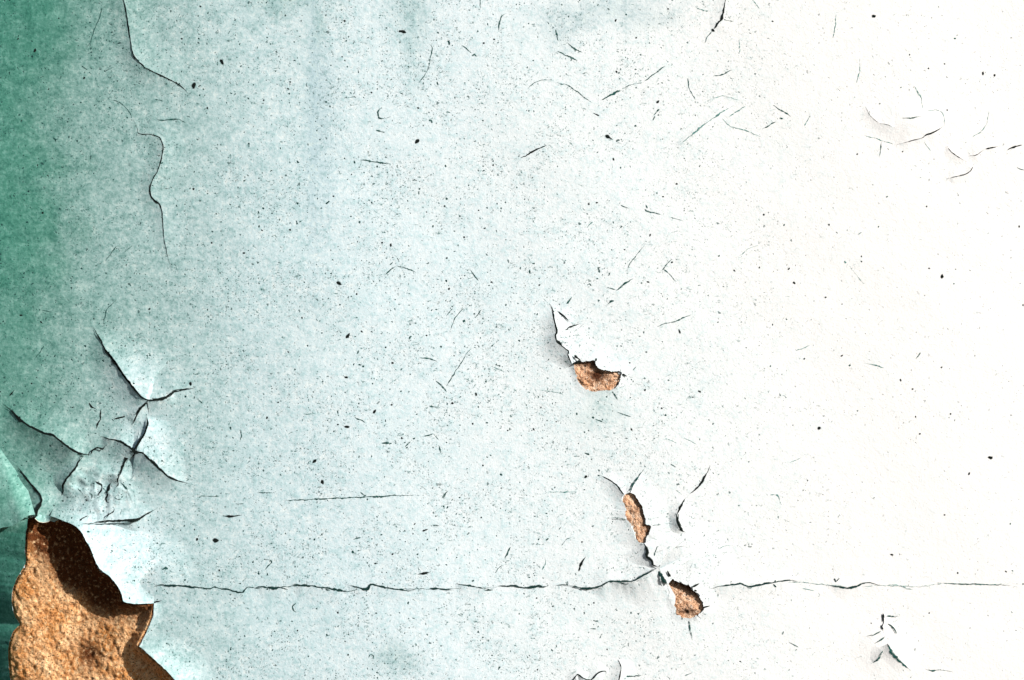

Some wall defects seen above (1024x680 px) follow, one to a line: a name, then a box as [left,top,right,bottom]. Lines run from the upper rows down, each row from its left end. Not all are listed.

crack [82,0,198,270]
peeling [0,449,215,680]
crack [0,300,412,531]
crack [130,467,1001,680]
peeling [568,339,634,397]
crack [553,453,651,520]
peeling [610,480,670,551]
peeling [665,561,719,624]